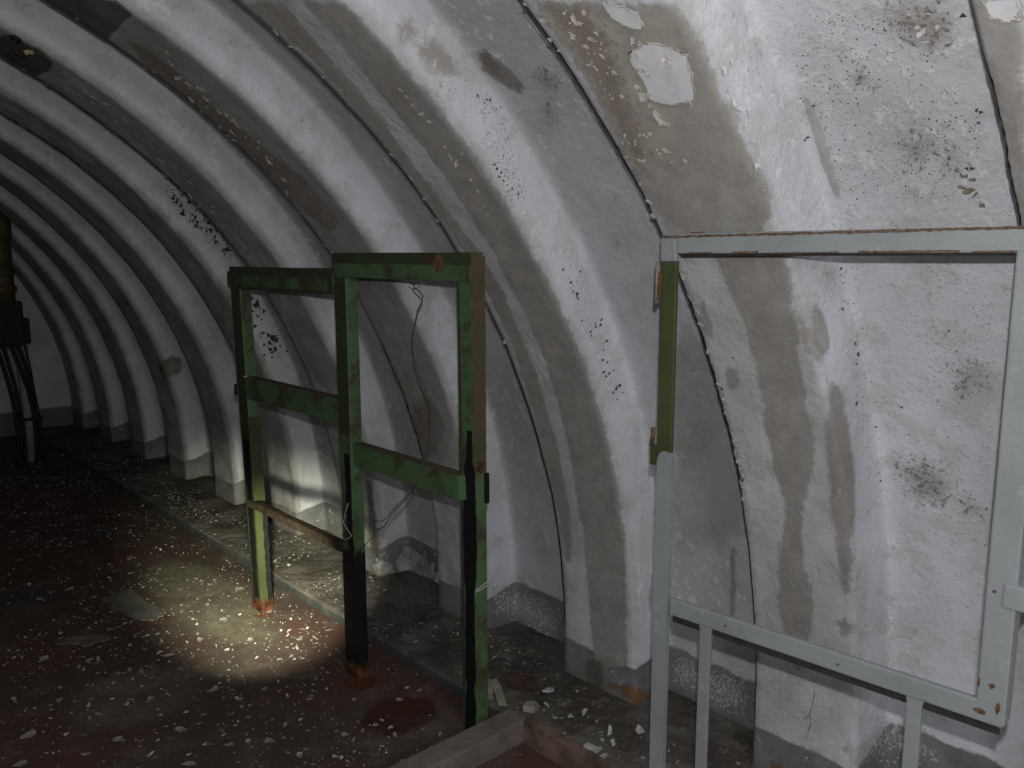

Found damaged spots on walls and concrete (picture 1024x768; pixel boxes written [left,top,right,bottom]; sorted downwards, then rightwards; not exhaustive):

damp [250,3,478,253]
peeling [600,0,688,165]
damp [537,1,771,236]
damp [305,2,627,667]
damp [717,256,813,640]